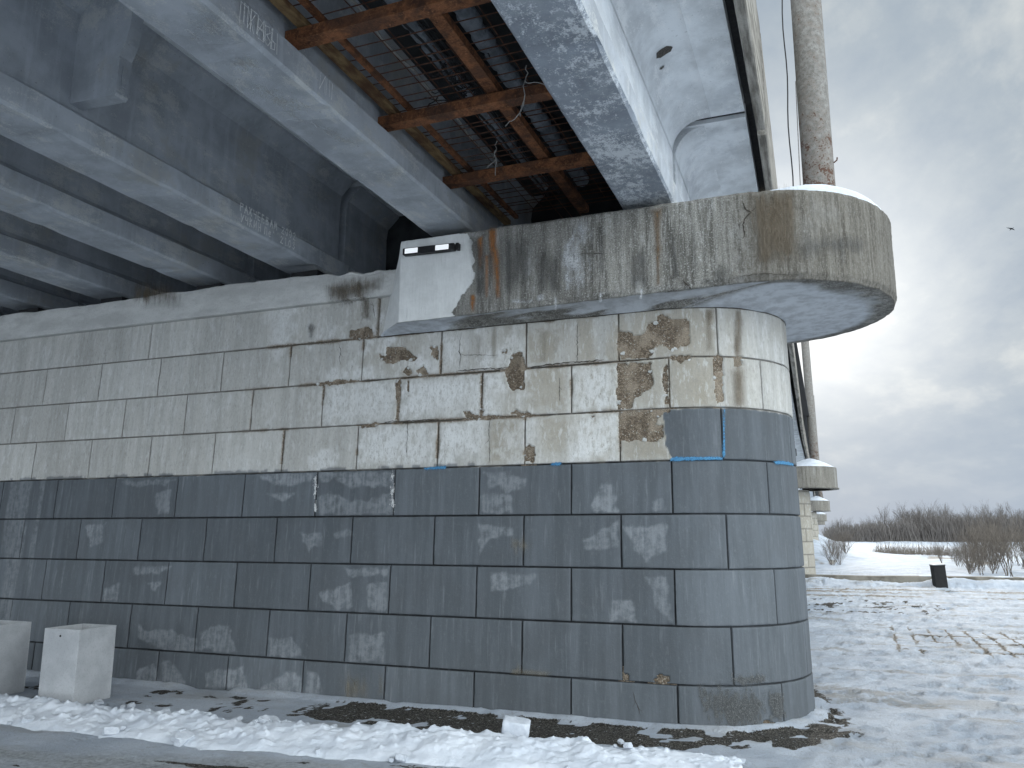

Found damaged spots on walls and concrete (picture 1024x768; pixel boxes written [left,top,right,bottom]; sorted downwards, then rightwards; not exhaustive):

crack [738,203,754,238]
leakage [331,281,374,318]
spalling [356,345,442,429]
spalling [500,348,531,391]
spalling [586,309,691,447]